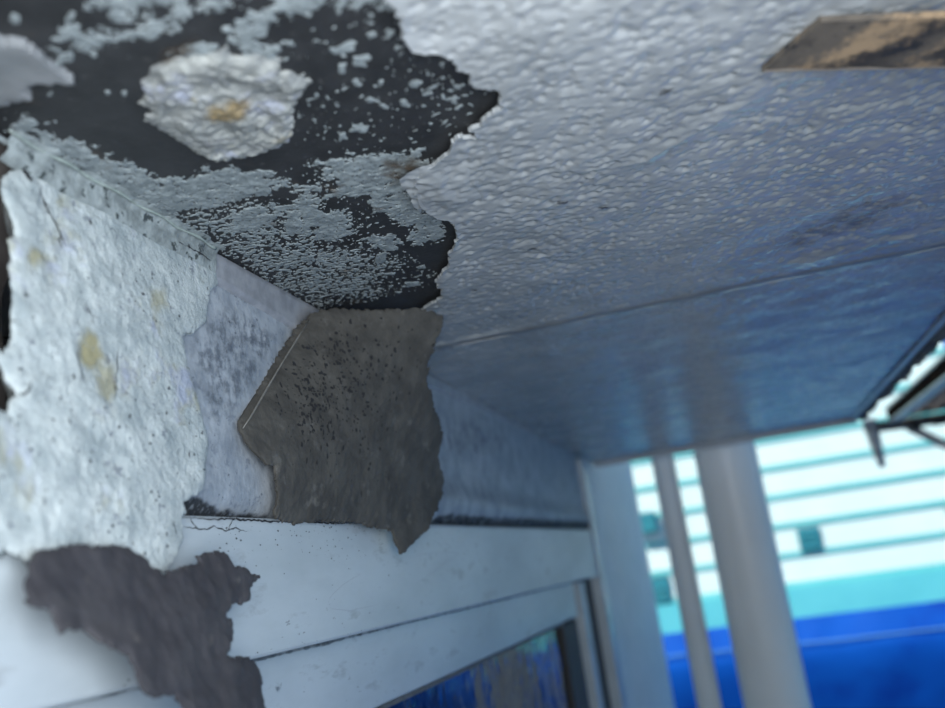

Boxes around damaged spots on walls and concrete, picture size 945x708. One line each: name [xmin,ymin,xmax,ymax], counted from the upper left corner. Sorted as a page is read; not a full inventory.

peeling [0,0,500,708]